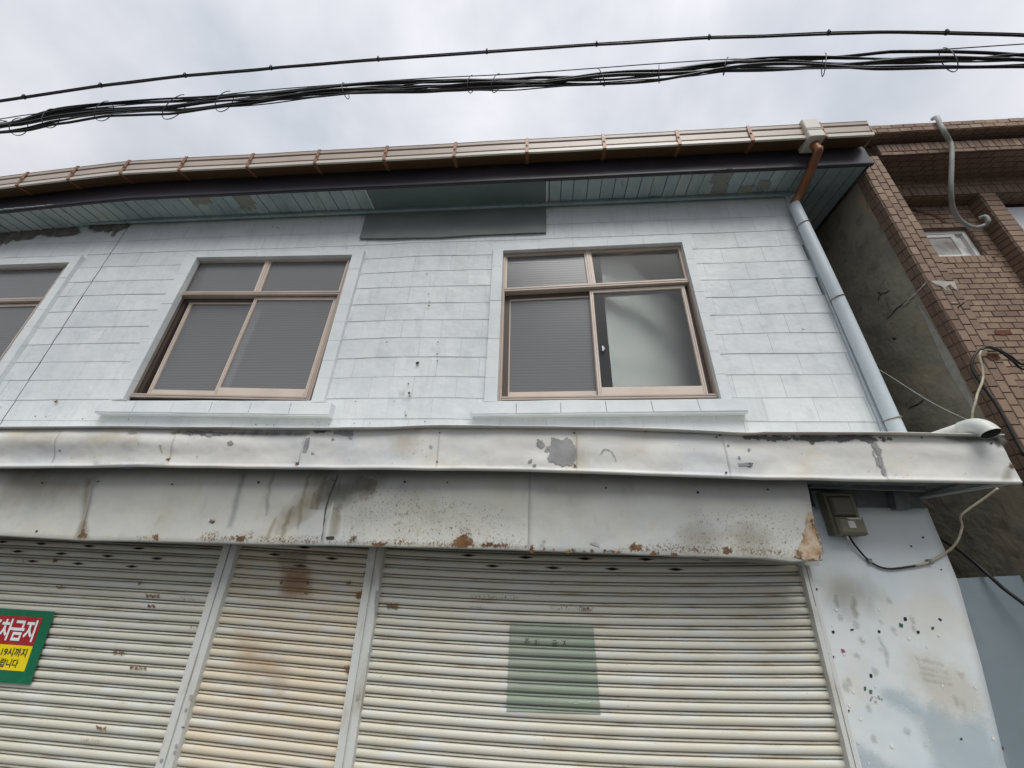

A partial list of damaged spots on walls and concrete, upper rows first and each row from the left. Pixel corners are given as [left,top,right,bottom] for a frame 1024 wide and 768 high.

peeling [0,223,130,244]
peeling [528,437,576,467]
peeling [738,435,892,477]
rust [200,494,783,557]